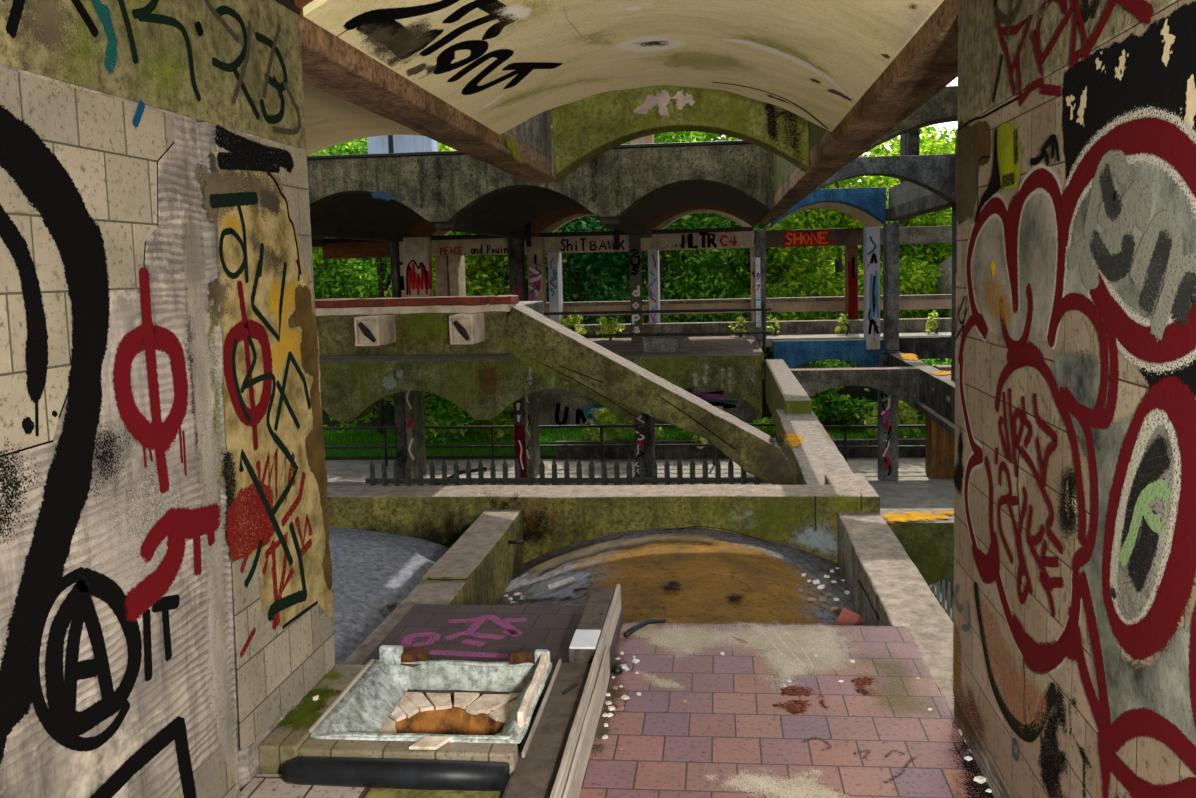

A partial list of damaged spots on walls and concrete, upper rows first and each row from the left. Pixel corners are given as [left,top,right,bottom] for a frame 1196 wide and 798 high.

water stain [1,0,83,83]
peeling [634,90,695,117]
water stain [764,102,806,162]
peeling [1062,1,1196,185]
peeling [157,142,174,227]
peeling [1119,340,1196,397]
peeling [0,434,53,550]
flaking render [69,161,334,762]
water stain [336,481,726,578]
water stain [784,517,838,560]